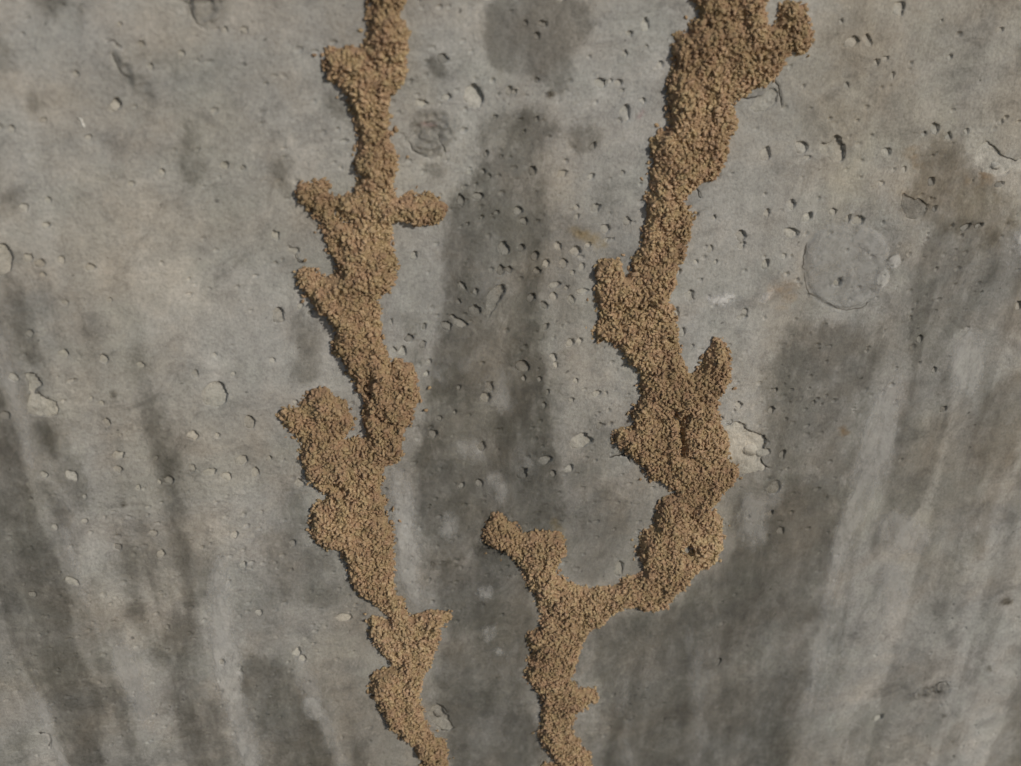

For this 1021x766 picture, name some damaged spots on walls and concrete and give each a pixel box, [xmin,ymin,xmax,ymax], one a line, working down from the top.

leakage [953,332,982,393]
leakage [828,383,896,588]
leakage [210,561,257,766]